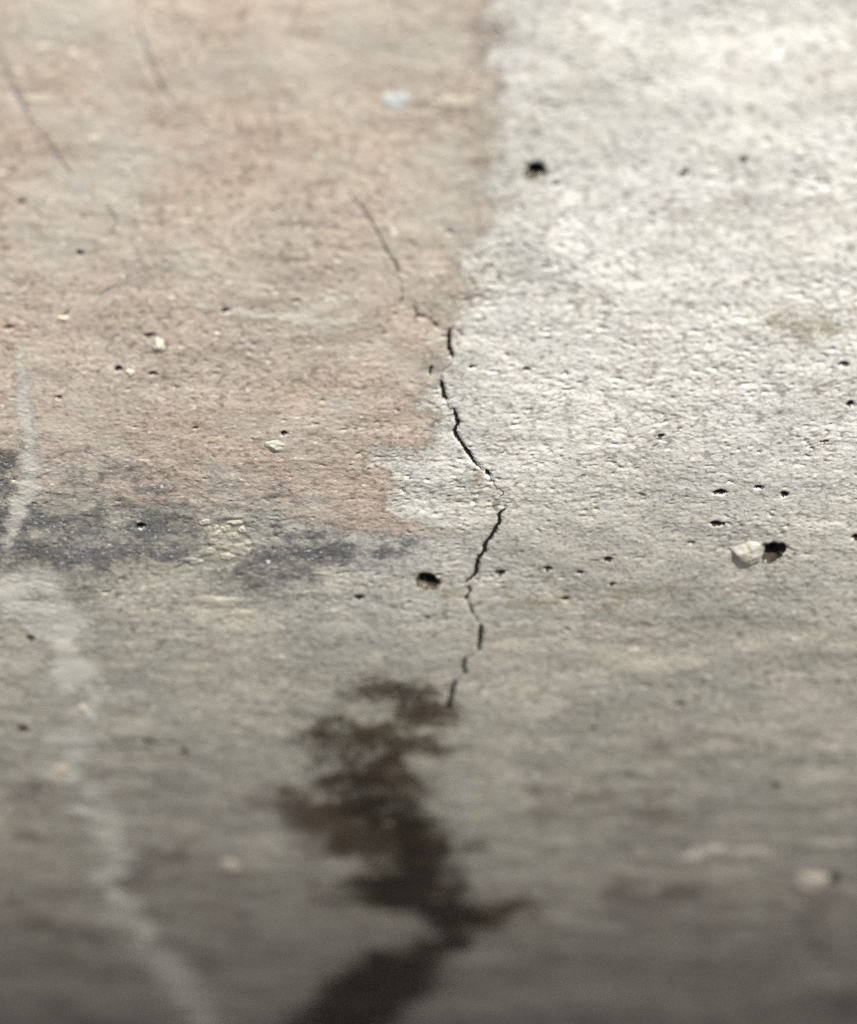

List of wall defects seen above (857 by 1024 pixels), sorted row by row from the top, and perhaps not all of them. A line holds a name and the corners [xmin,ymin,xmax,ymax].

crack [349,190,506,709]
damp [279,678,544,1024]